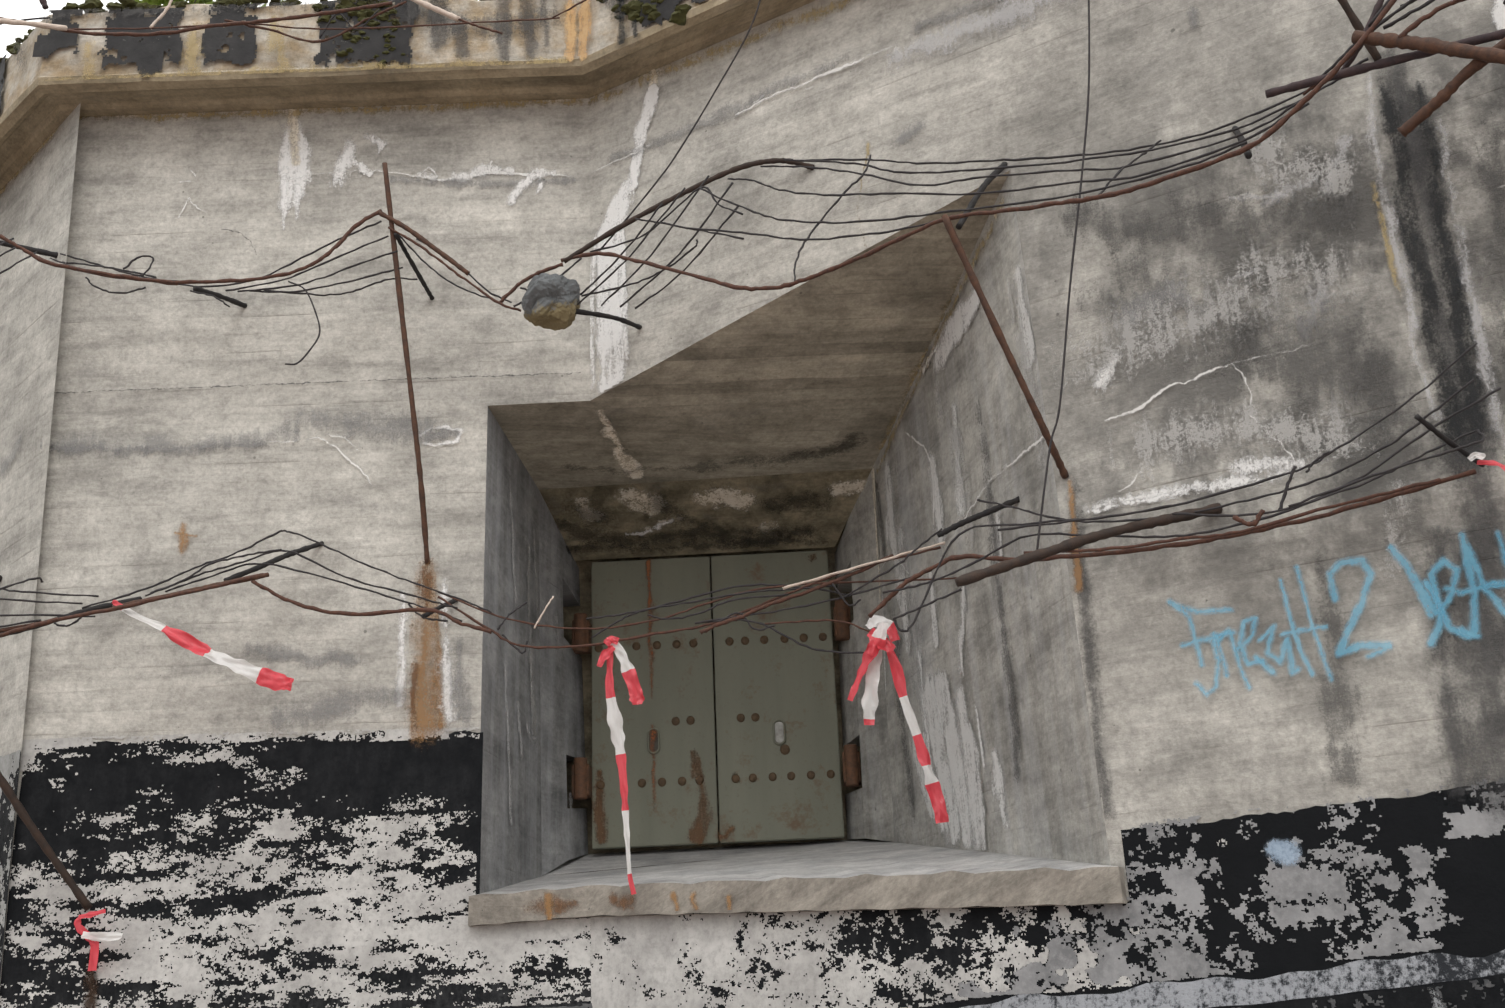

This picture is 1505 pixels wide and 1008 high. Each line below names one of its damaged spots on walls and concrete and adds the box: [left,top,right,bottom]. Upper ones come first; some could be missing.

water stain [41,0,568,81]
water stain [605,0,638,45]
water stain [887,0,1059,64]
water stain [555,69,1020,851]
water stain [1007,266,1045,465]
water stain [1063,52,1505,817]
corrosion [394,561,458,740]
water stain [505,523,559,824]
peeling [0,727,1505,1008]